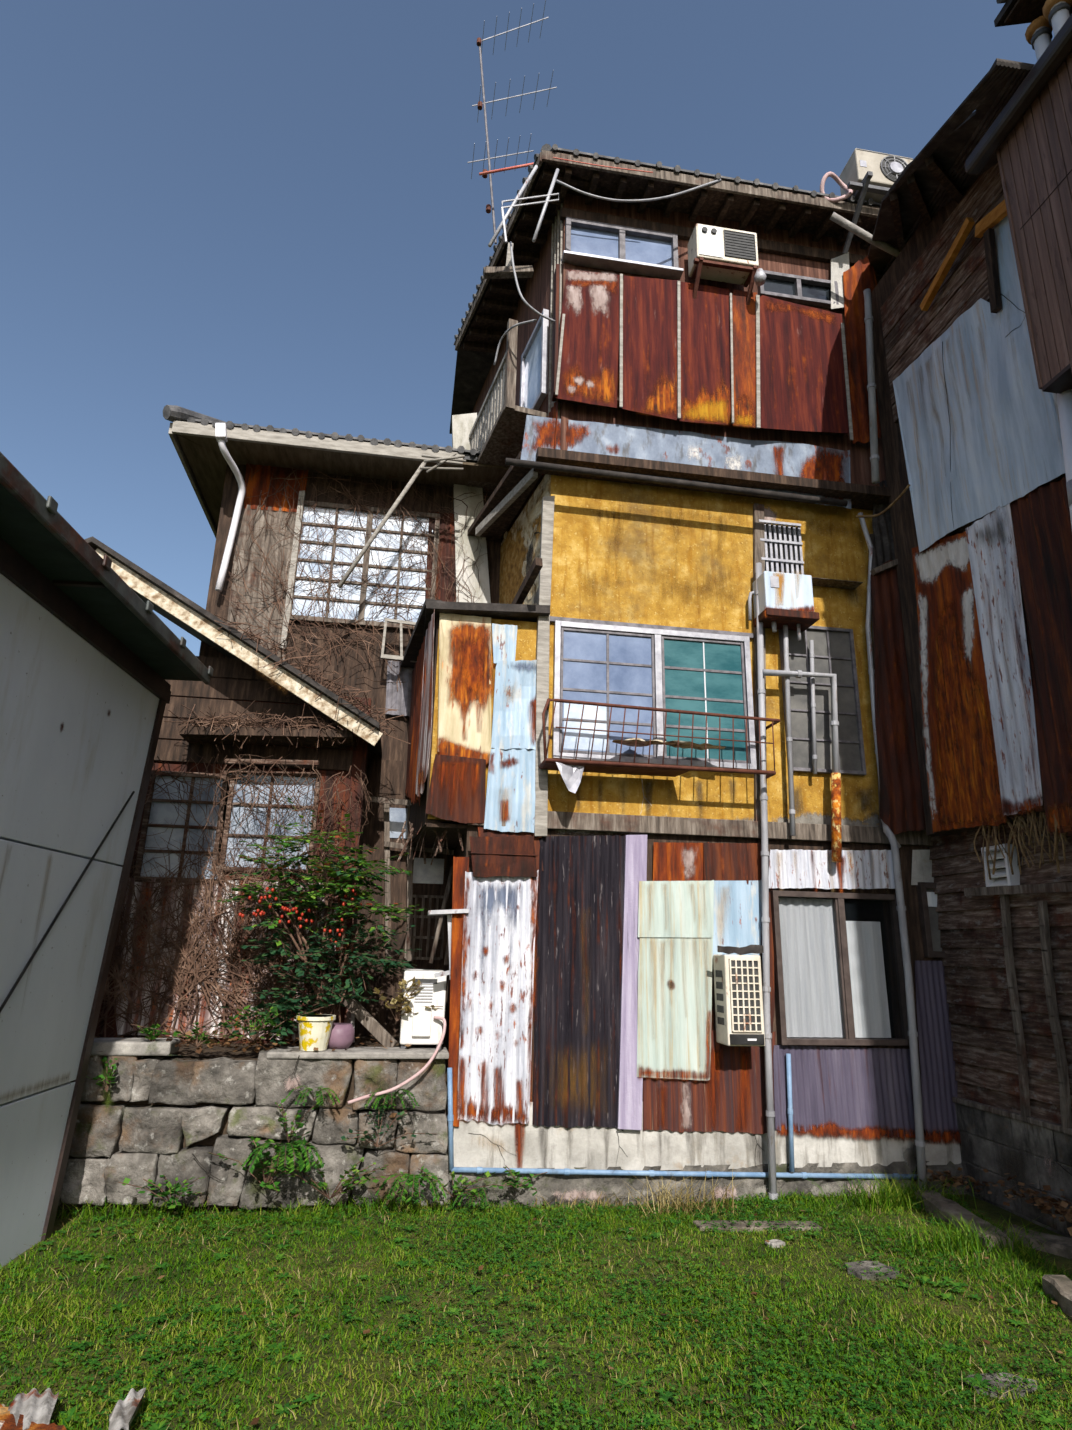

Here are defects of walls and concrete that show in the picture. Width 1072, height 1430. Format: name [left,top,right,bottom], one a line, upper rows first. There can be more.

corrosion [532,420,589,450]
corrosion [564,369,614,401]
corrosion [647,376,753,425]
corrosion [773,446,784,475]
corrosion [801,449,845,500]
corrosion [418,619,517,814]
peeling [916,538,970,812]
peeling [962,589,974,660]
corrosion [936,601,1042,825]
corrosion [831,773,851,893]
corrosion [458,877,537,1167]
corrosion [639,1012,720,1128]